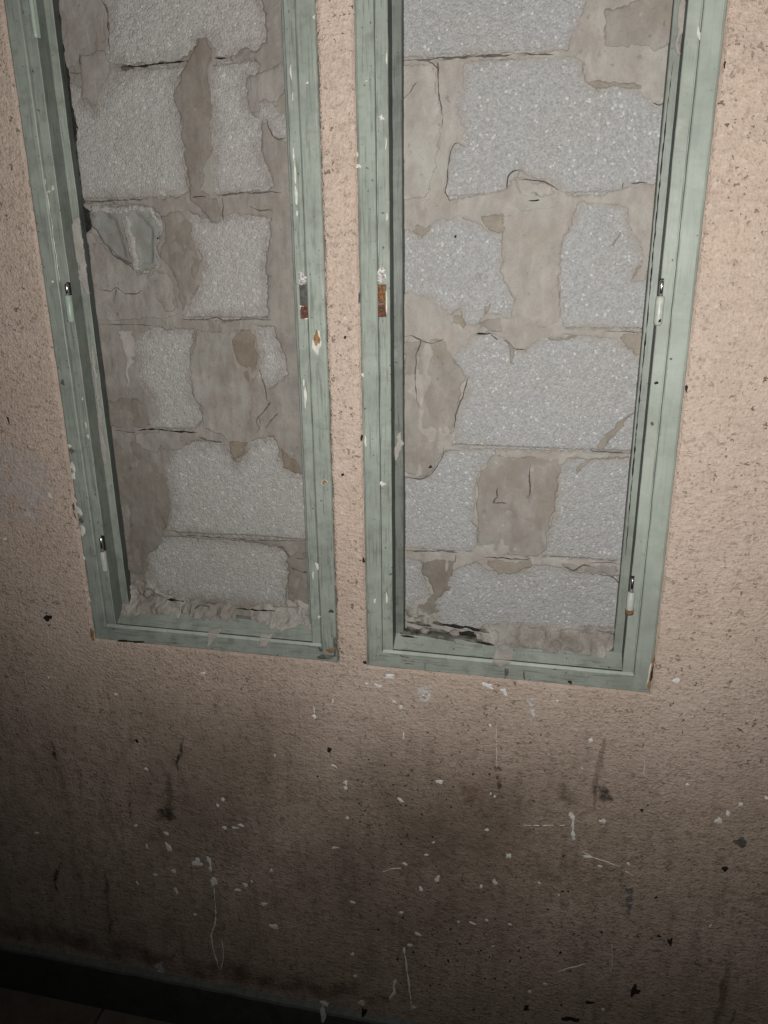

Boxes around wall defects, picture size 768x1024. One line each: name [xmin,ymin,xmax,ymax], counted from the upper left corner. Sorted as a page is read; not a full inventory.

spalling [90,205,162,273]
peeling [69,499,85,537]
peeling [401,621,494,646]
damp [389,898,452,1009]